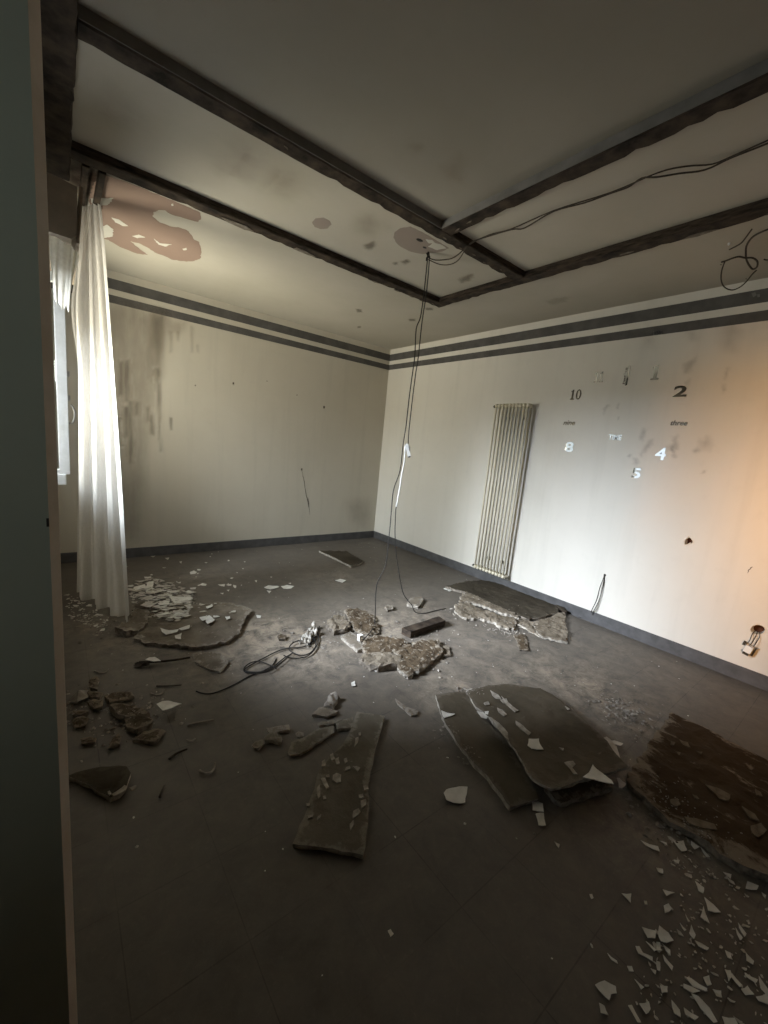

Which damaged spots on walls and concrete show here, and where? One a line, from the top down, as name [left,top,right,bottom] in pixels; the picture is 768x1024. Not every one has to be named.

peeling [89,176,202,262]